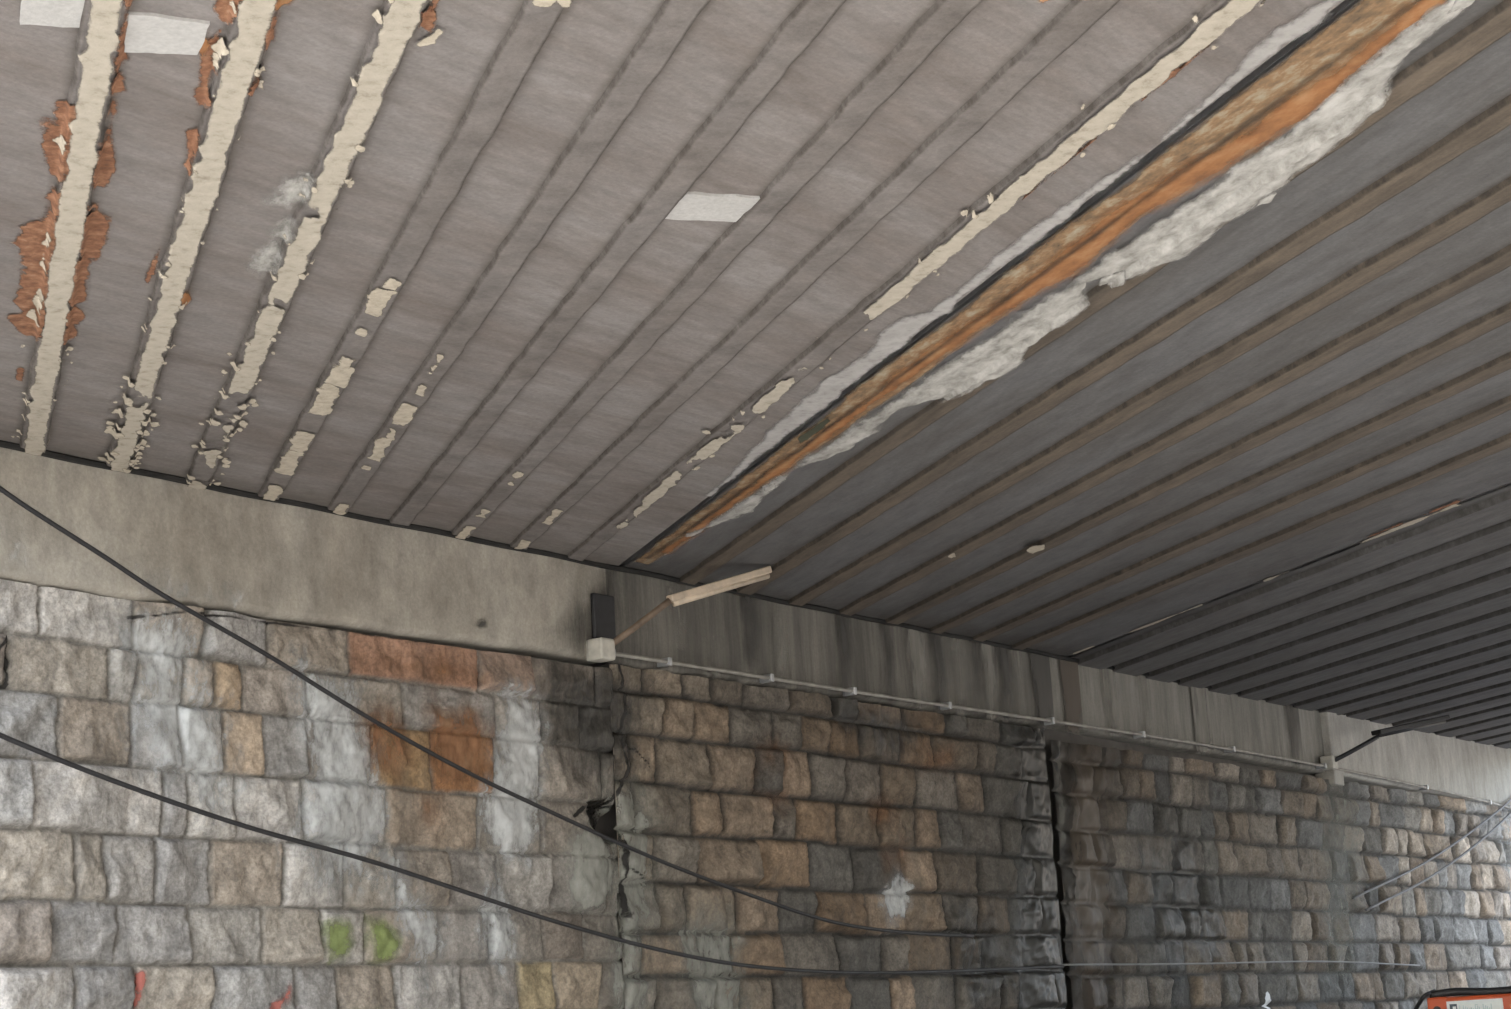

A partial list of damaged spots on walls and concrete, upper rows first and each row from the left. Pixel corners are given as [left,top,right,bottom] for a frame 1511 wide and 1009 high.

corrosion [7,101,77,340]
peeling [11,0,122,456]
corrosion [63,0,133,345]
peeling [97,0,277,473]
corrosion [193,0,243,108]
peeling [263,431,315,501]
peeling [186,0,431,490]
peeling [616,357,831,529]
corrosion [635,0,1448,564]
peeling [863,0,1265,331]
leakage [685,0,1475,537]
corrosion [430,705,485,784]